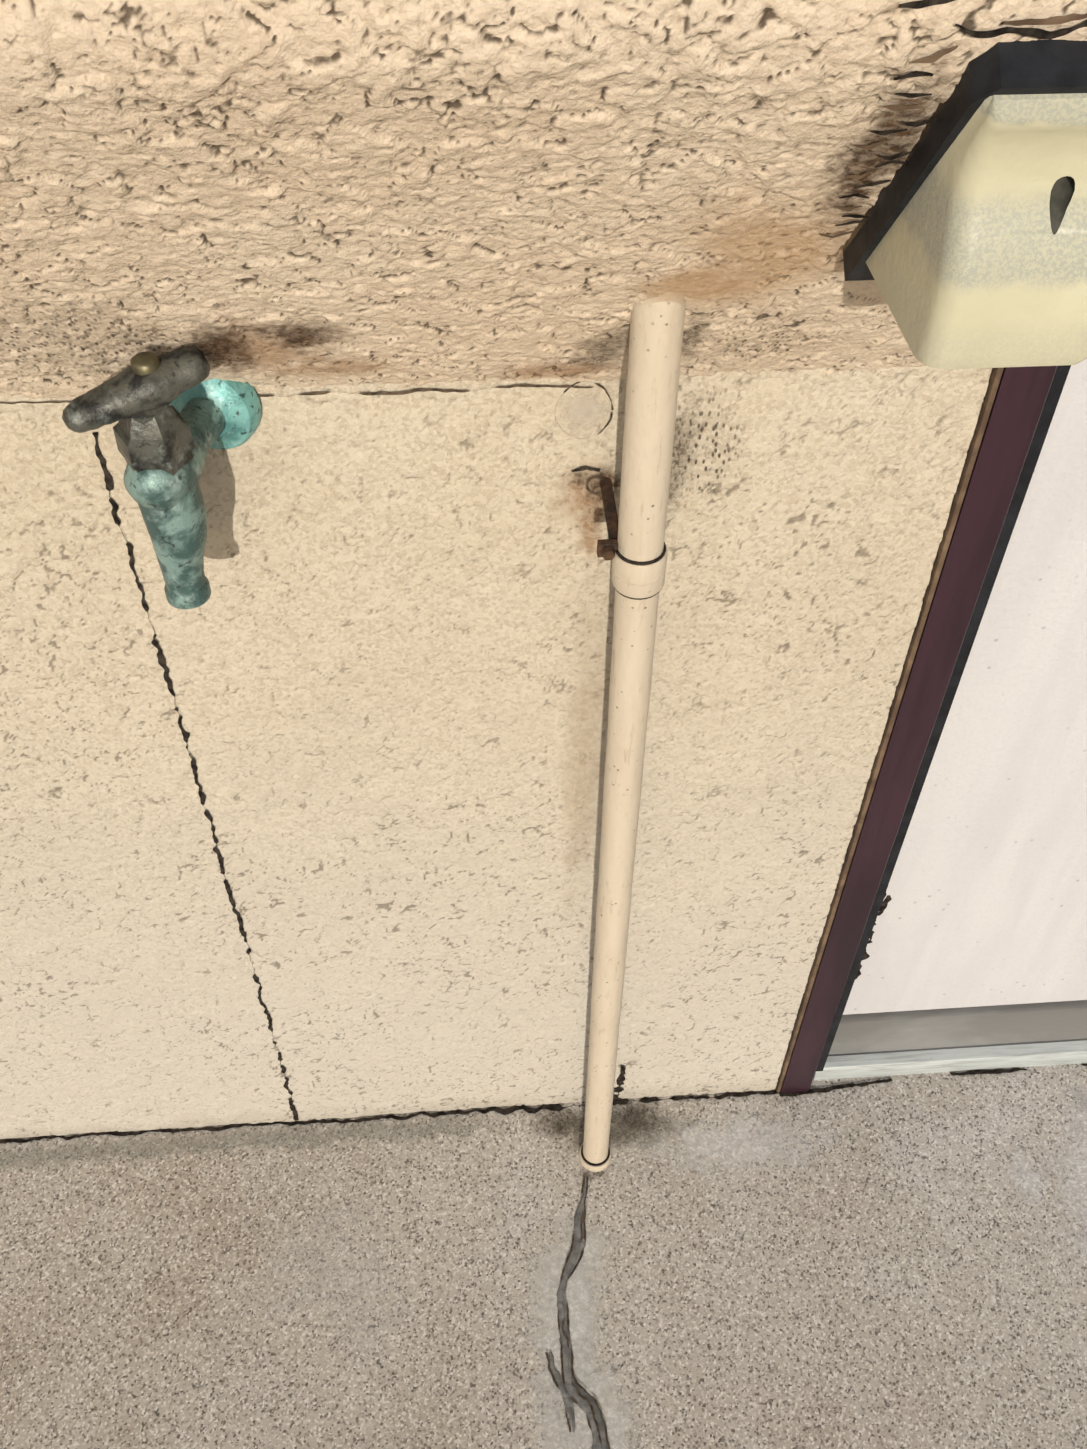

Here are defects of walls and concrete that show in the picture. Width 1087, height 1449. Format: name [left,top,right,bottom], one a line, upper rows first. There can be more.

crack [898,0,956,9]
crack [257,384,604,397]
crack [0,398,71,406]
rust [571,466,621,500]
crack [0,432,892,1144]
crack [950,1068,1027,1076]
crack [545,1176,610,1449]